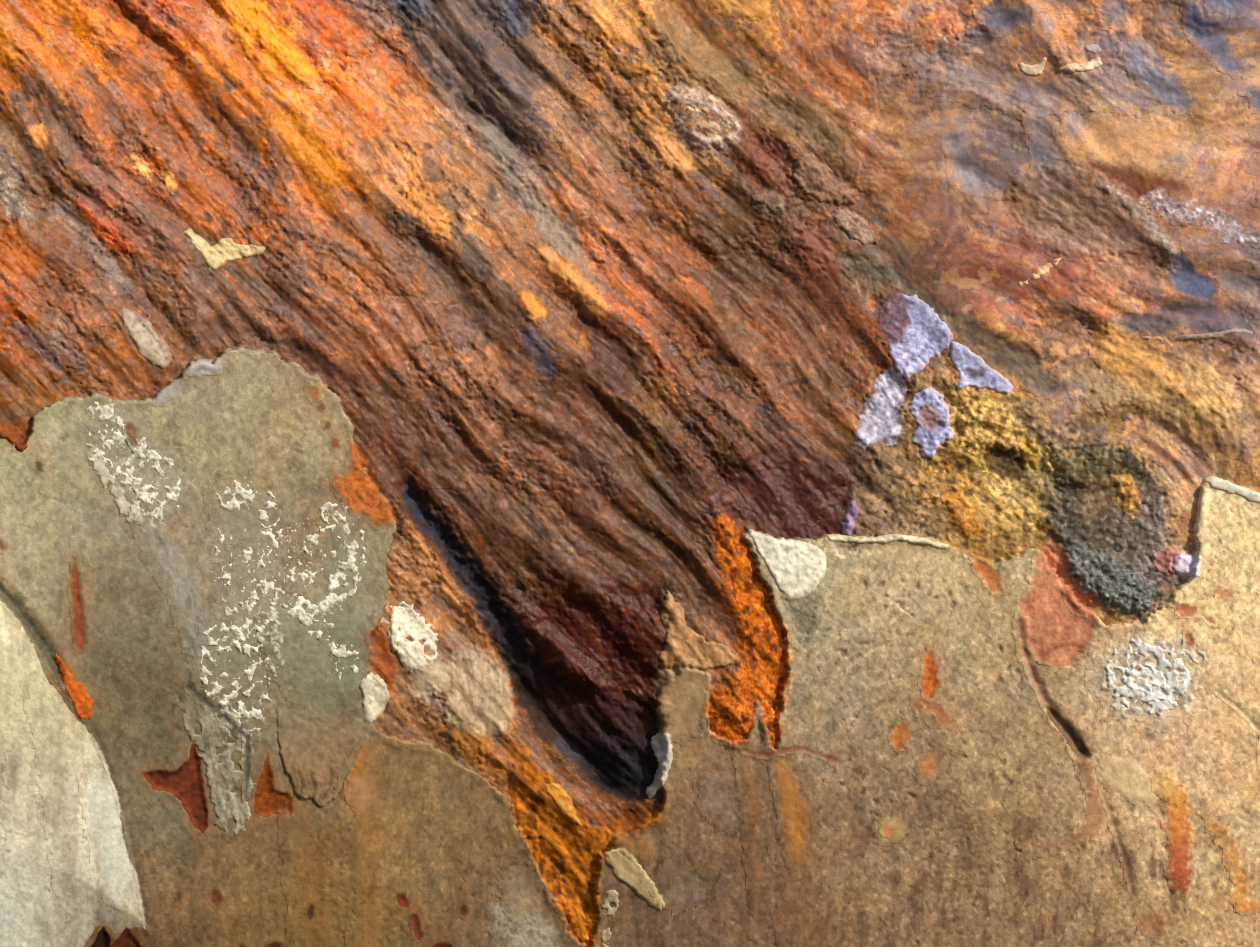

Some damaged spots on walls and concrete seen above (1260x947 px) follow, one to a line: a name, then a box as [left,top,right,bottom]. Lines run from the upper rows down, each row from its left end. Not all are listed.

peeling [183,228,265,270]
corrosion [0,0,1260,700]
peeling [853,286,1014,458]
peeling [85,307,519,836]
peeling [746,500,950,653]
water stain [836,364,1215,735]
corrosion [54,653,94,720]
corrosion [374,626,670,947]
peeling [646,590,737,799]
corrosion [888,647,957,786]
corrosion [1152,767,1260,915]
crack [1213,687,1260,771]